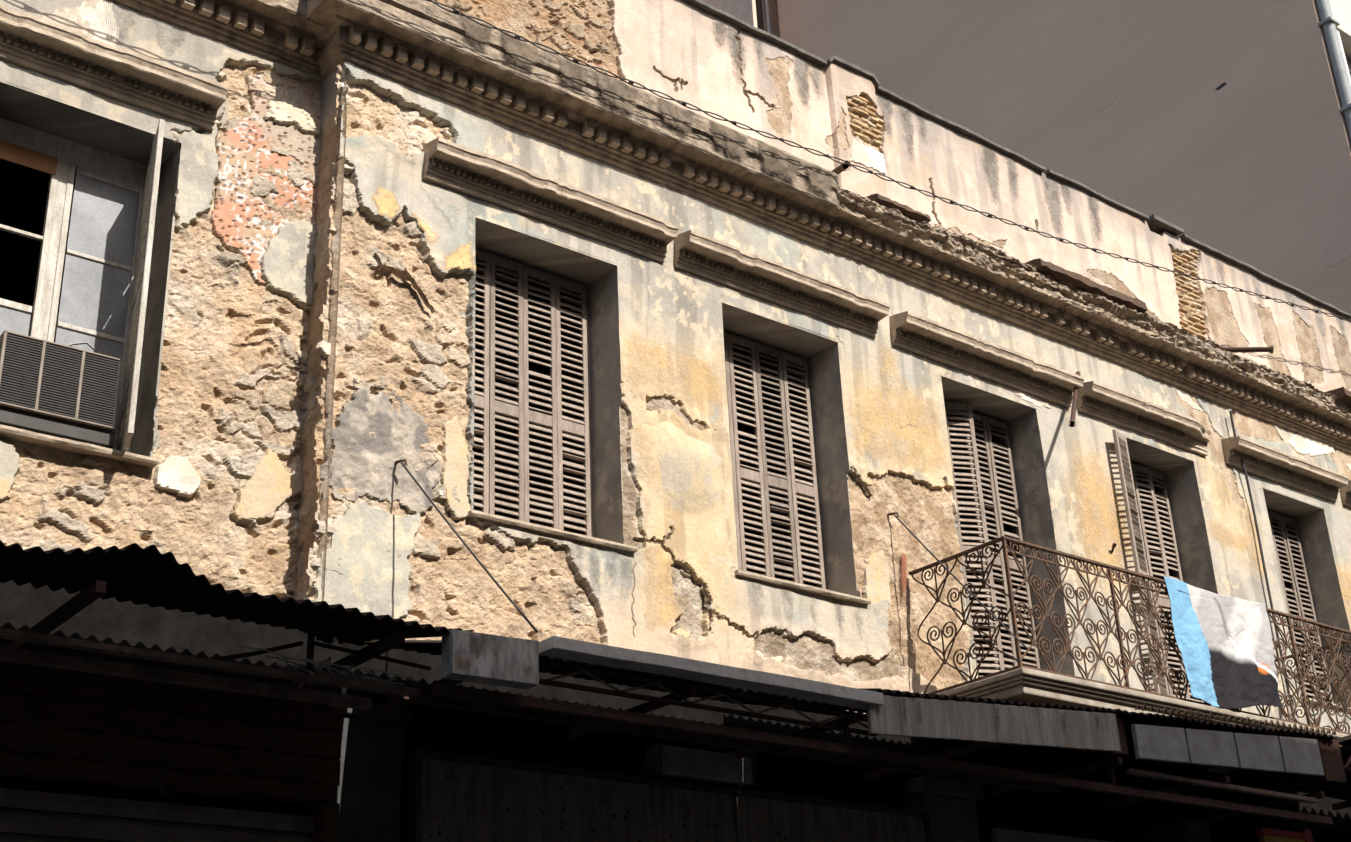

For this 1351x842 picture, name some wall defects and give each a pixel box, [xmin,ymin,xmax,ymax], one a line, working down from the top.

flaking render [434,0,622,81]
crack [735,32,775,113]
flaking render [825,95,884,151]
spalling [0,61,601,644]
flaking render [1170,248,1351,389]
crack [631,529,753,637]
spalling [754,472,970,690]